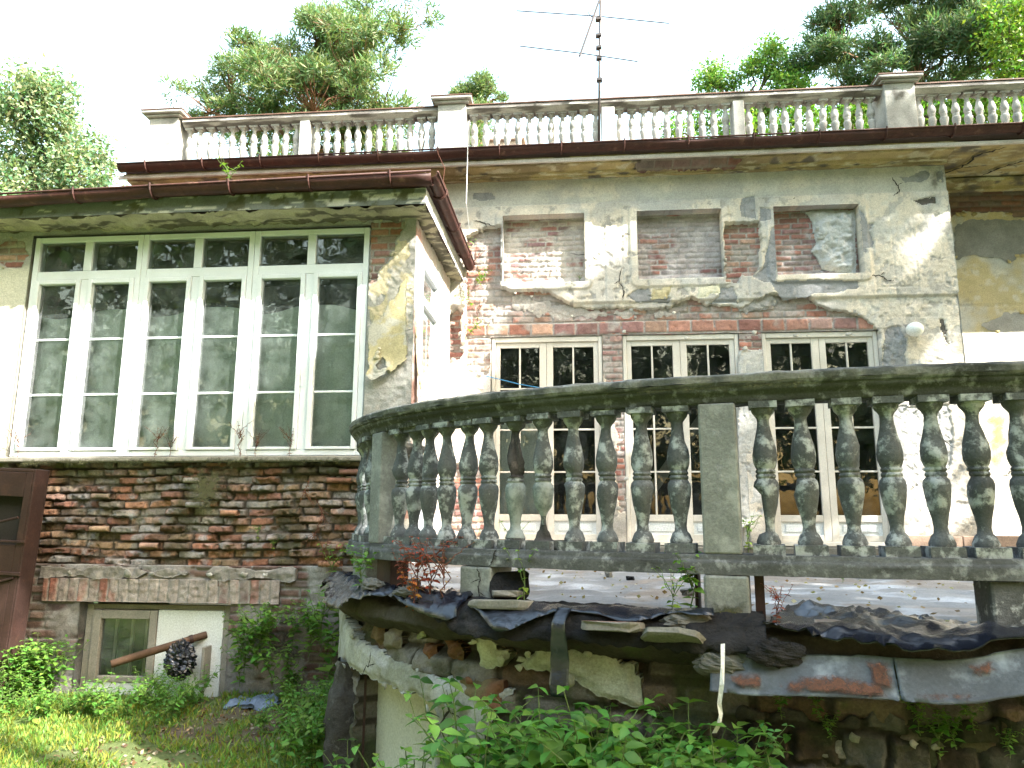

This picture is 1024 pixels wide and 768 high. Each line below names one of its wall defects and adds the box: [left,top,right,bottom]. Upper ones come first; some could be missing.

peeling [949,191,1024,263]
peeling [366,218,425,402]
spalling [449,196,907,382]
peeling [981,310,1024,333]
spalling [613,412,628,512]
peeling [335,610,551,768]
peeling [568,649,645,708]